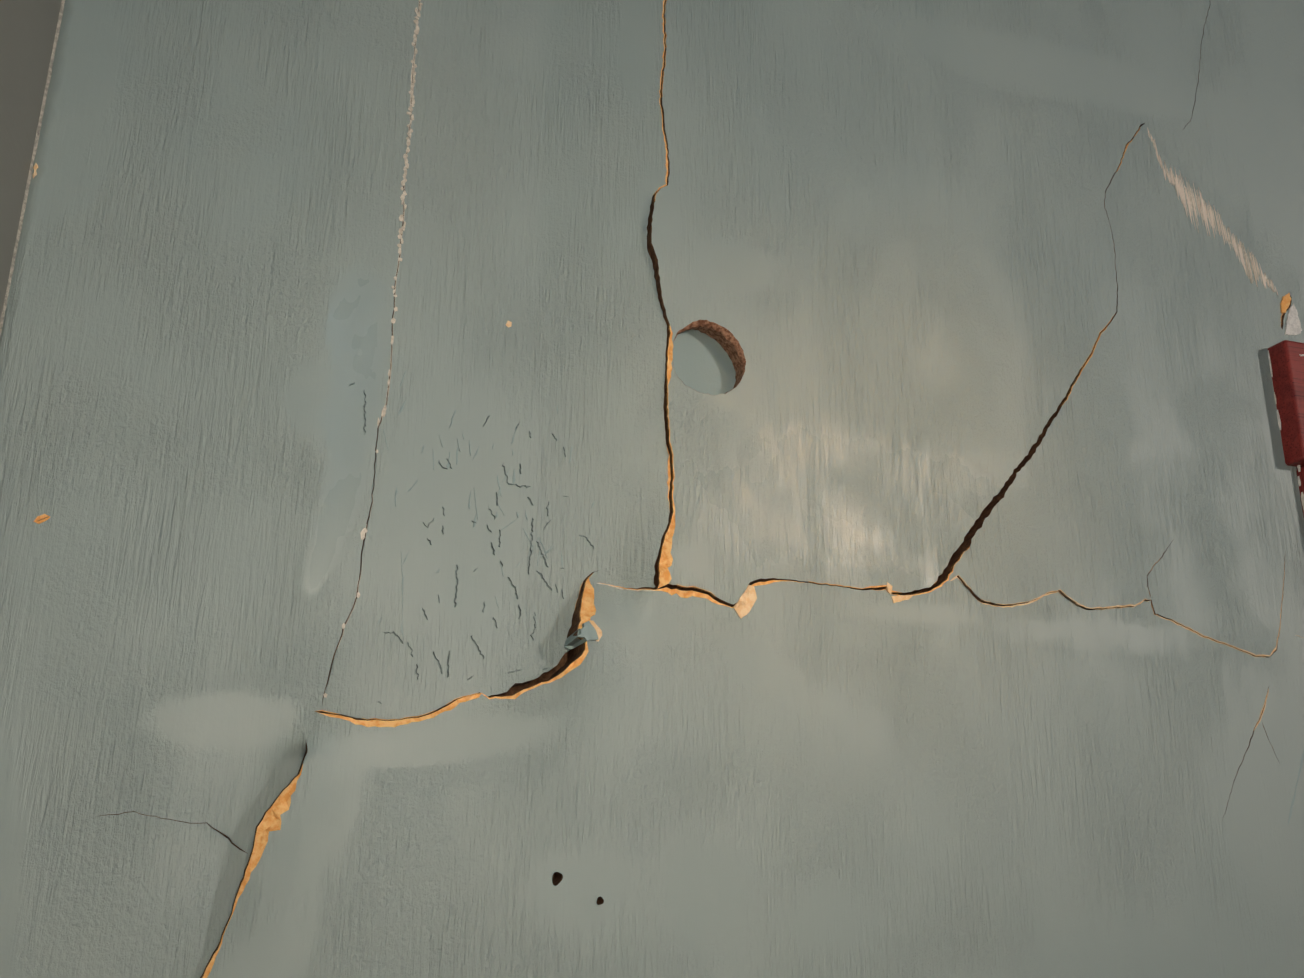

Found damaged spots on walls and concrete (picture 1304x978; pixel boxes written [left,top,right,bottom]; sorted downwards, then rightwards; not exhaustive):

peeling [1147,127,1302,336]
crack [315,0,1304,817]
crack [101,743,307,978]